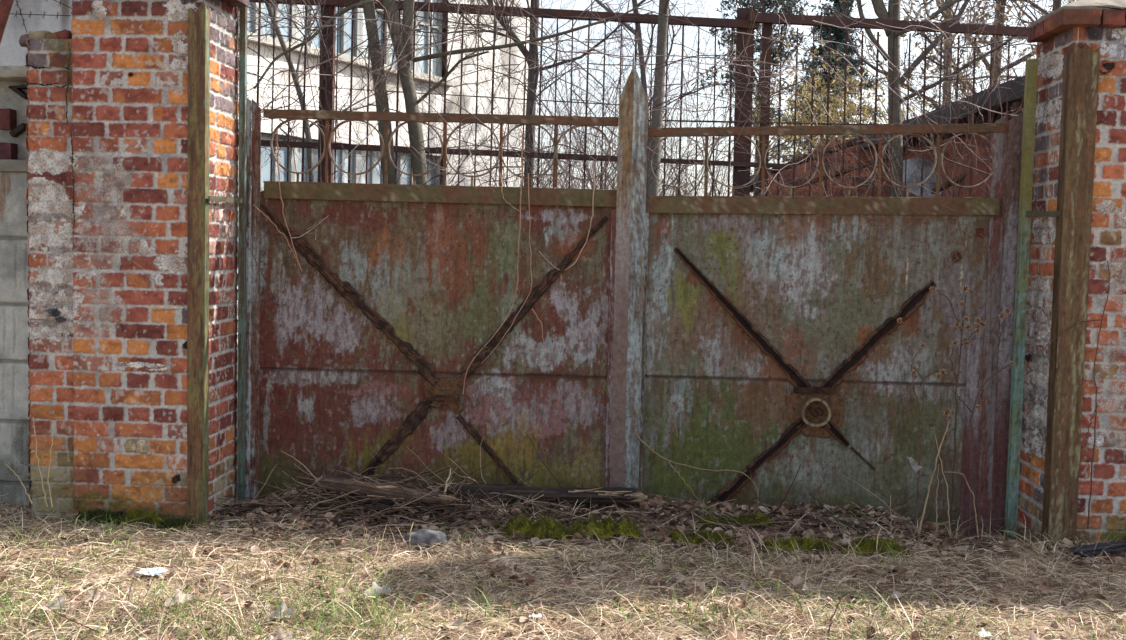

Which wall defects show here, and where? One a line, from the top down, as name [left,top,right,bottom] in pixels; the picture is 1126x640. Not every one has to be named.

damp [41,309,66,323]